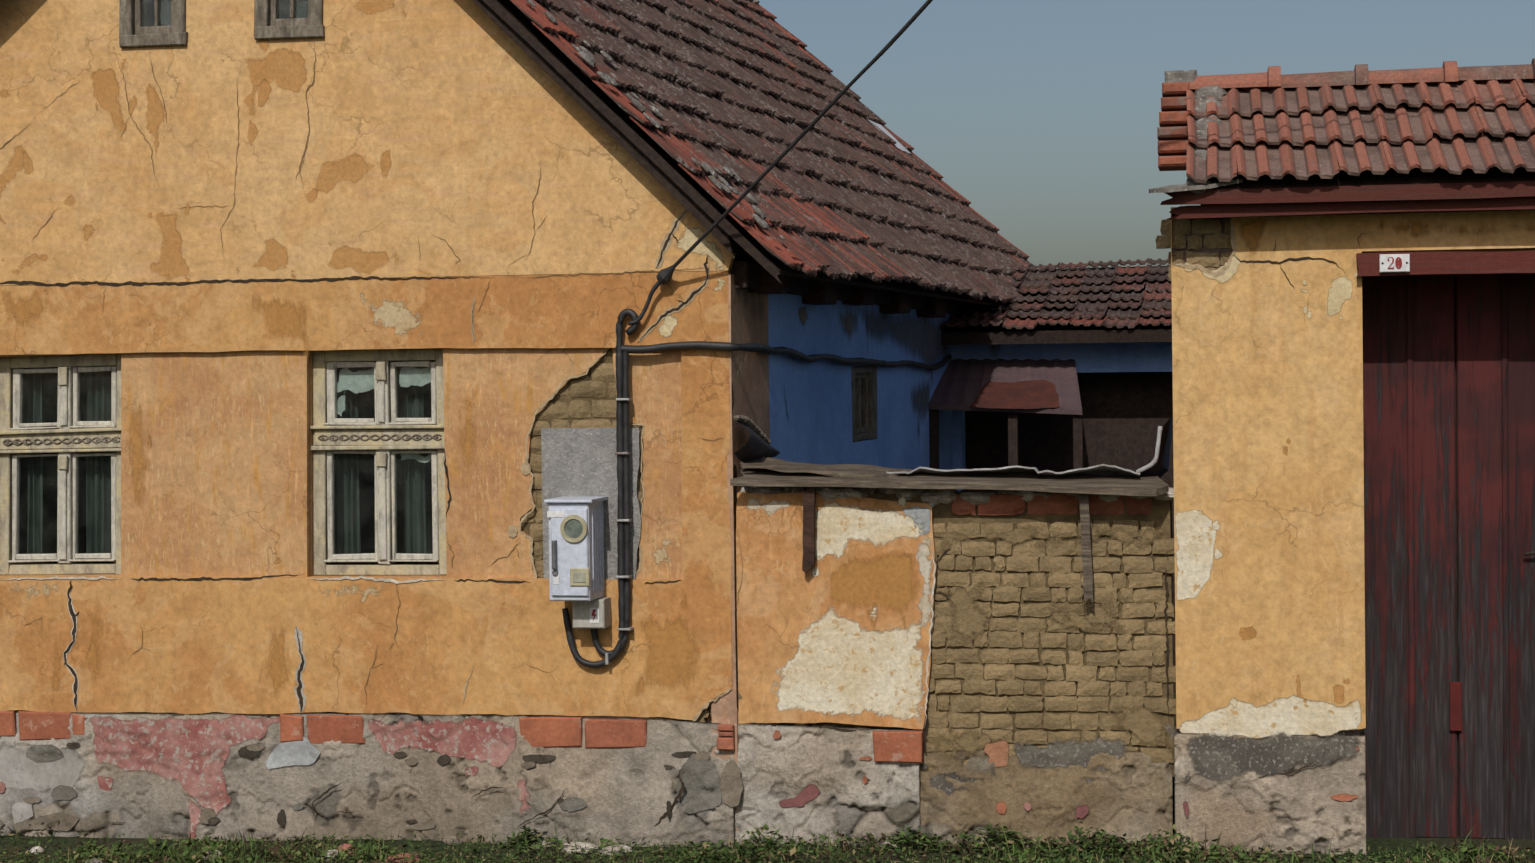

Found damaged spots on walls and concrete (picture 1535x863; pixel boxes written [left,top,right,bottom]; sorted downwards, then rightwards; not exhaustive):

peeling [92,59,164,152]
peeling [245,39,306,144]
peeling [307,150,391,202]
crack [0,40,719,346]
peeling [328,243,388,274]
crack [1236,232,1369,290]
flaking render [507,348,672,578]
peeling [1175,509,1223,600]
crack [21,581,79,713]
crack [294,626,306,714]
peeling [664,495,936,821]
peeling [1179,675,1361,738]